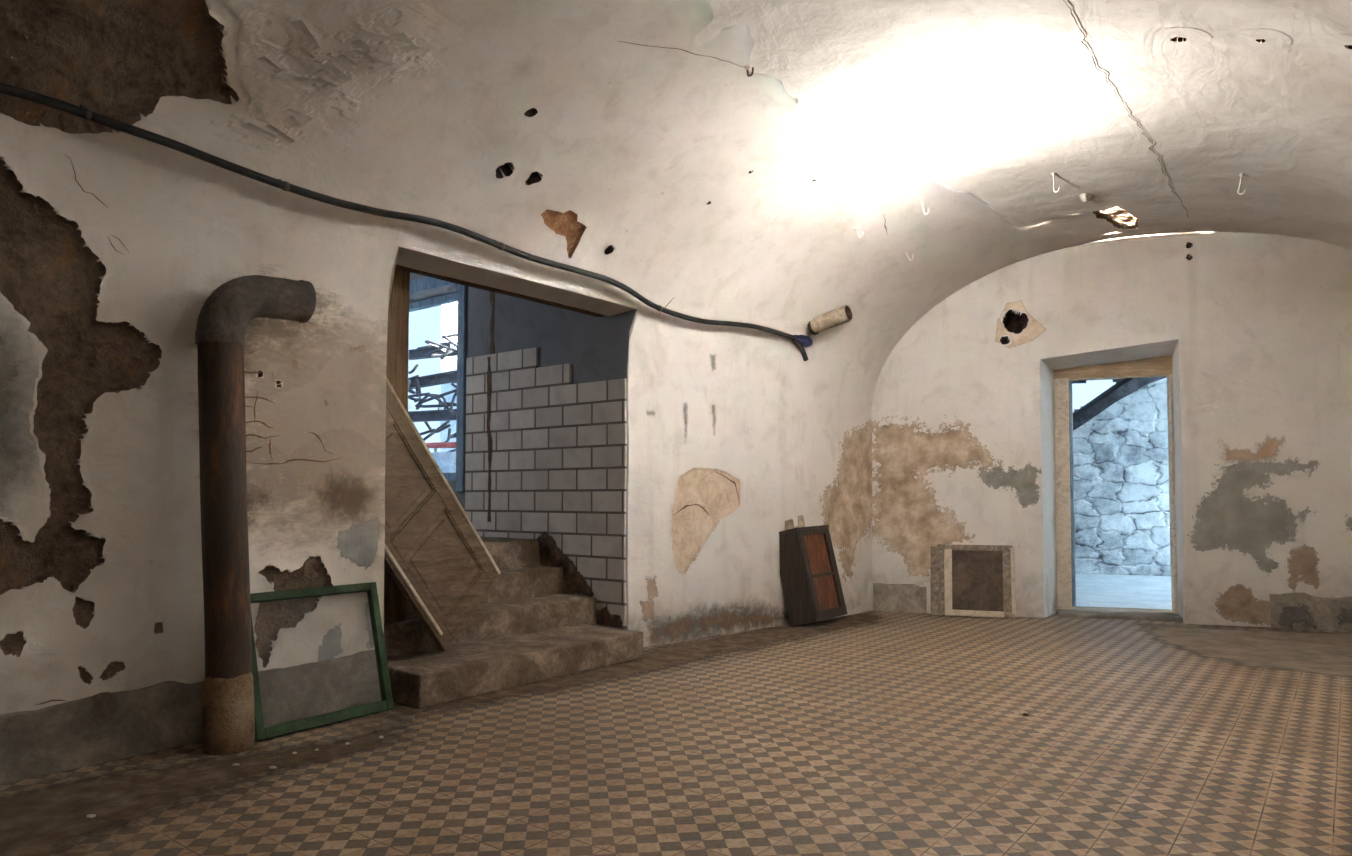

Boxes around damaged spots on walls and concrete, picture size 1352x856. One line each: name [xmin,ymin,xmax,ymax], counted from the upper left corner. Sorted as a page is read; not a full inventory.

crack [1063,0,1188,217]
spalling [477,148,628,274]
spalling [0,0,488,702]
spalling [988,297,1046,356]
spalling [640,455,750,622]
peeling [819,415,1042,585]
peeling [1186,438,1320,629]